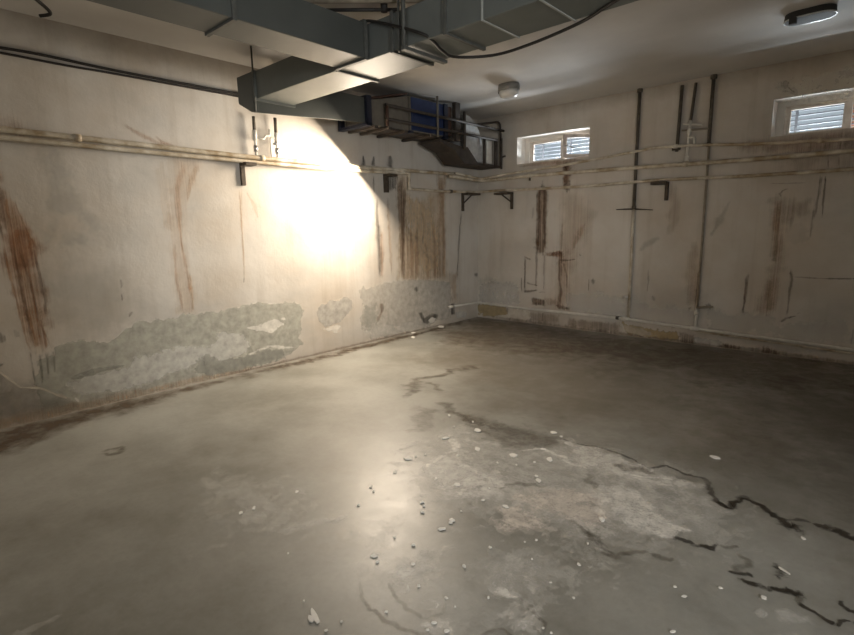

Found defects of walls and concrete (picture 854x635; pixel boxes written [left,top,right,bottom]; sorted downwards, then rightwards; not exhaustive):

rust [0,192,55,382]
peeling [34,302,304,413]
peeling [317,279,467,339]
rust [389,175,446,281]
rust [535,184,581,310]
crack [564,439,854,541]
crack [570,520,854,627]